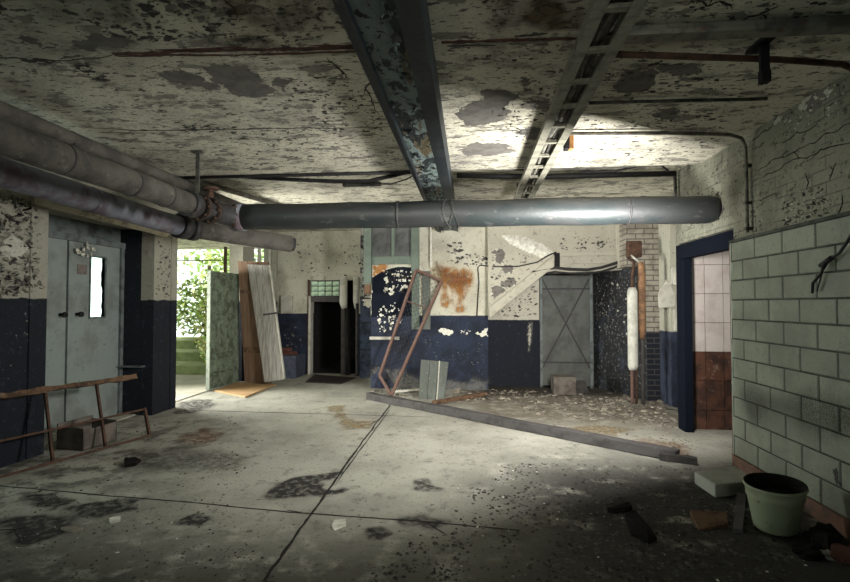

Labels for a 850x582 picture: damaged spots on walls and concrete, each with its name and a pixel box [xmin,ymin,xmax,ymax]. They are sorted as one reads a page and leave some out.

leakage [524,0,581,30]
crack [0,44,355,78]
crack [88,83,390,133]
peeling [458,142,516,157]
crack [752,119,850,206]
peeling [0,195,46,298]
peeling [297,242,412,332]
rust [432,267,473,312]
crack [0,405,520,581]